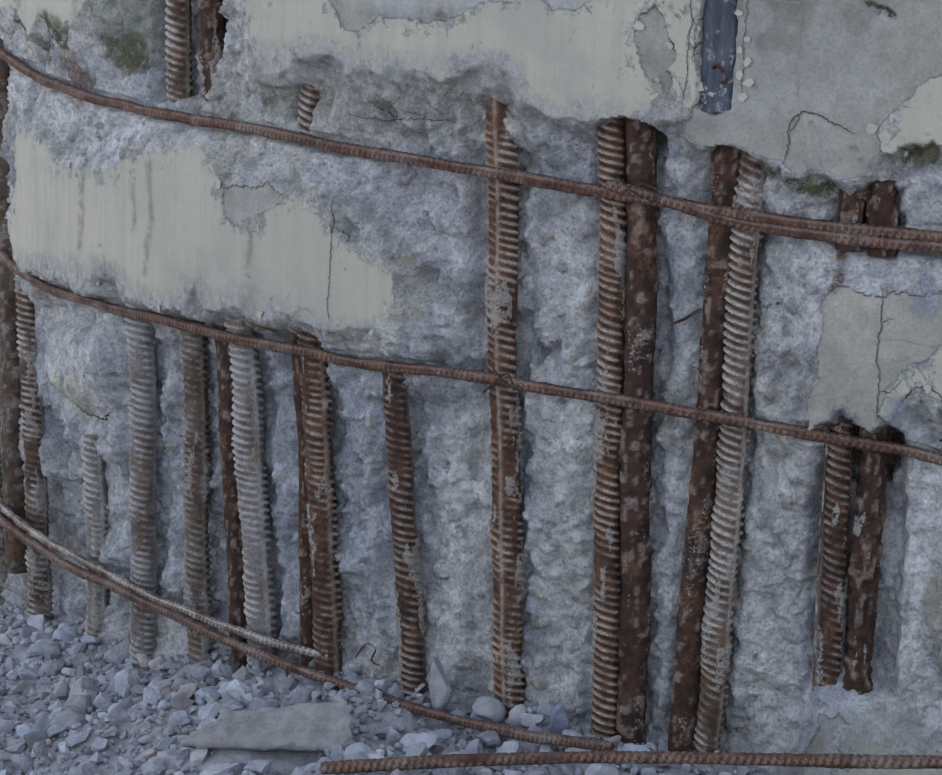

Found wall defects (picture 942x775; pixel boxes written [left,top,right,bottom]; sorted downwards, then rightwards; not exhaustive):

crack [741,0,749,87]
crack [865,1,897,17]
peeling [0,0,942,232]
crack [782,110,855,165]
crack [326,199,350,319]
spalling [0,58,942,454]
crack [875,289,942,422]
spalling [0,260,942,775]
rust [825,416,906,695]